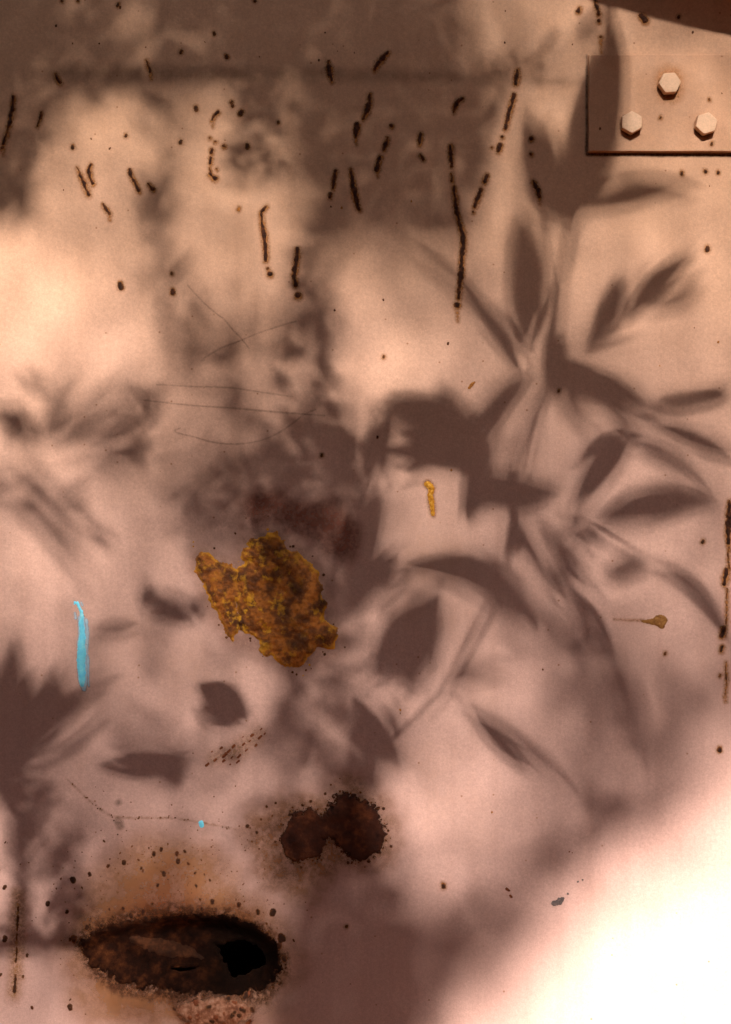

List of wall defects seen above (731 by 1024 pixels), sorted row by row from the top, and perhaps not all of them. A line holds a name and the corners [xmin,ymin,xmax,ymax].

corrosion [0,95,16,155]
corrosion [490,68,521,155]
corrosion [76,163,96,197]
corrosion [328,167,362,213]
corrosion [258,205,273,278]
corrosion [291,247,303,300]
corrosion [447,144,490,322]
corrosion [424,480,435,517]
corrosion [192,492,358,676]
corrosion [631,615,667,629]
corrosion [718,499,731,702]
corrosion [239,778,392,895]